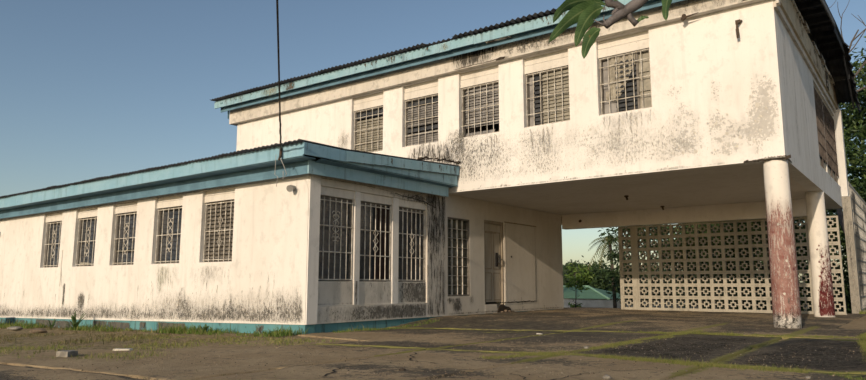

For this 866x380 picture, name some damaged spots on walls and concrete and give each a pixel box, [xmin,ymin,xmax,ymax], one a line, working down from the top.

leakage [408,128,512,187]
leakage [332,192,497,320]
leakage [1,284,302,321]